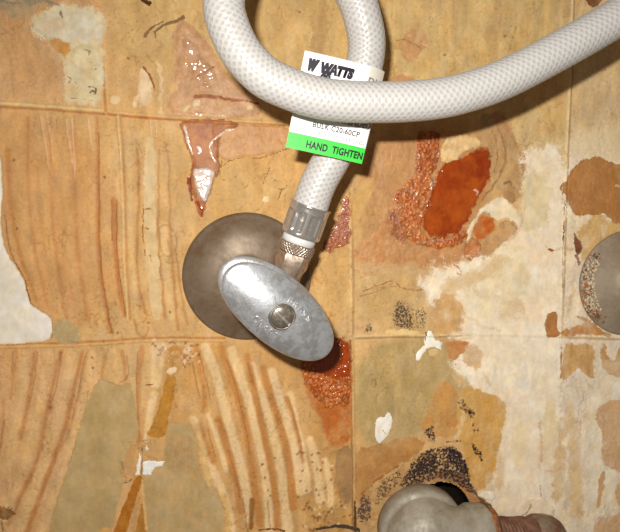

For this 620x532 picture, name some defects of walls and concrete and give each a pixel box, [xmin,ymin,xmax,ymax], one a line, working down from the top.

peeling [0,155,82,345]
rust [298,336,354,447]
rust [323,127,495,272]
mould [394,301,426,330]
damp [353,370,508,532]
spalling [440,133,482,163]
peeling [359,138,620,523]